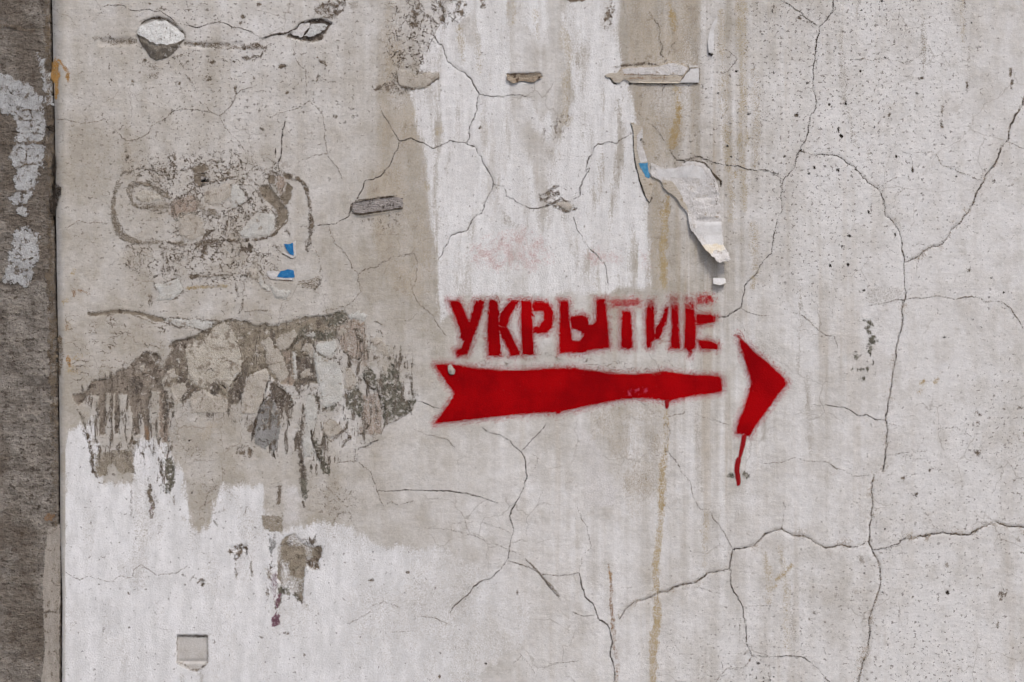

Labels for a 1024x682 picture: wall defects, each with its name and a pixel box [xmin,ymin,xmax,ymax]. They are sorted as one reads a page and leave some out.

spalling [263,18,332,43]
damp [413,3,484,73]
crack [62,87,251,149]
crack [92,4,342,178]
spalling [506,72,543,84]
peeling [72,121,419,508]
crack [304,0,1024,682]
peeling [227,484,326,635]
crack [161,628,208,672]